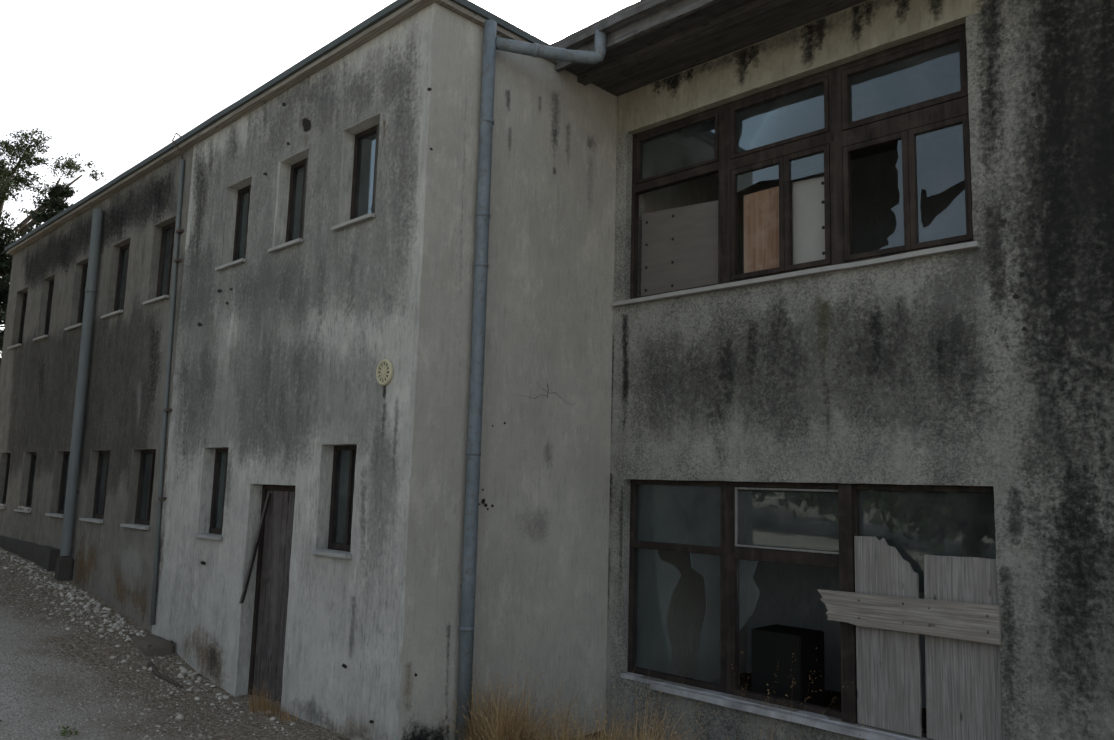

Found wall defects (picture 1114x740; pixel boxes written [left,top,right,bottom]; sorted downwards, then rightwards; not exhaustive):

damp [654,38,785,93]
damp [802,18,831,62]
damp [852,2,872,40]
damp [978,0,1002,162]
damp [24,175,174,286]
damp [1022,0,1114,642]
damp [403,726,449,740]